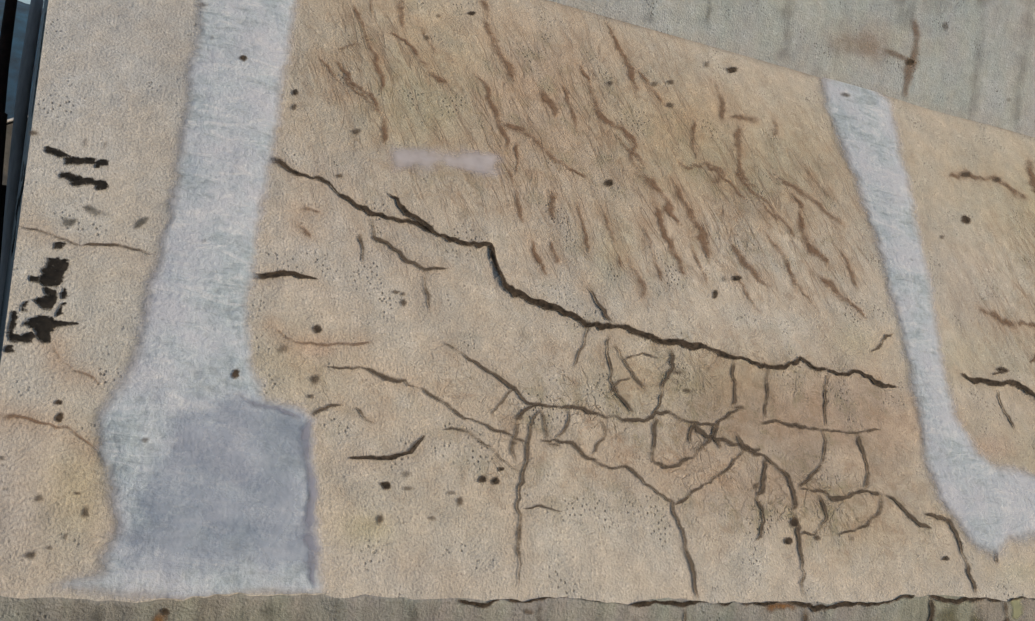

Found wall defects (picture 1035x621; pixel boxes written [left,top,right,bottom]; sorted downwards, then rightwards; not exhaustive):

peeling [45,146,69,158]
crack [321,5,446,141]
crack [479,1,585,273]
crack [608,26,662,101]
crack [541,66,864,316]
peeling [5,275,79,353]
crack [253,269,317,279]
crack [270,157,1035,621]